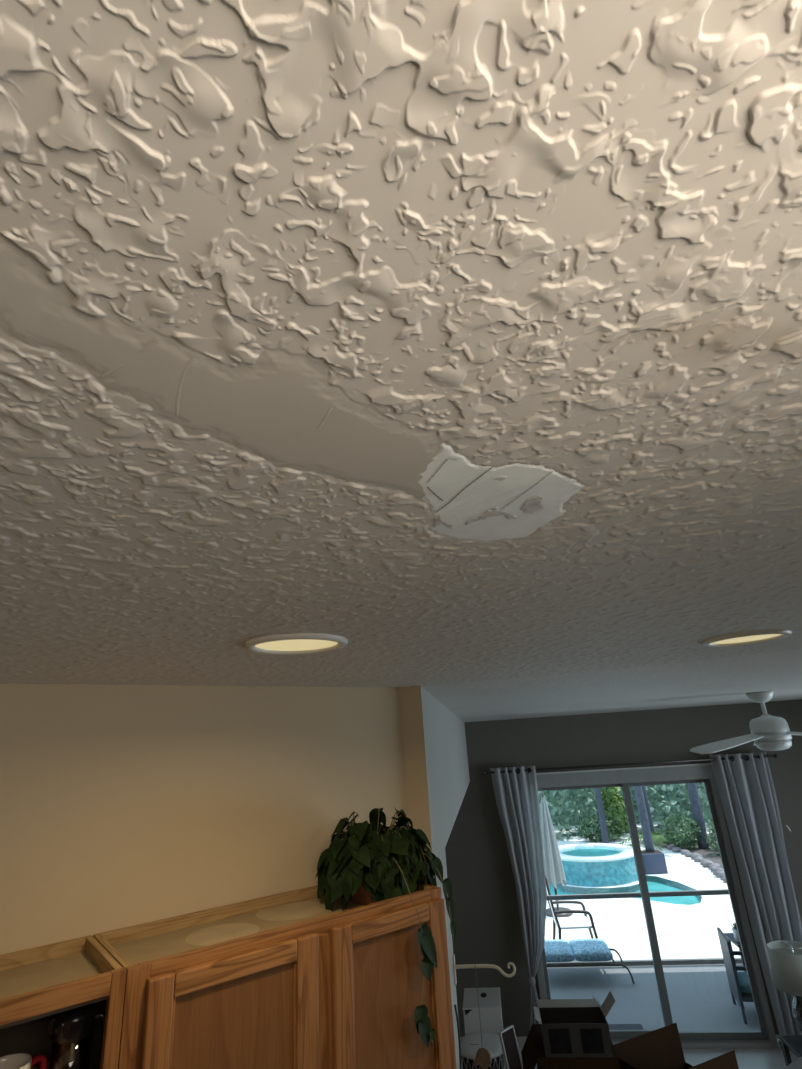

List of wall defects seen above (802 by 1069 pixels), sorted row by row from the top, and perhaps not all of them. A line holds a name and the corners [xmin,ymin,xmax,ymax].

peeling [417,443,585,542]